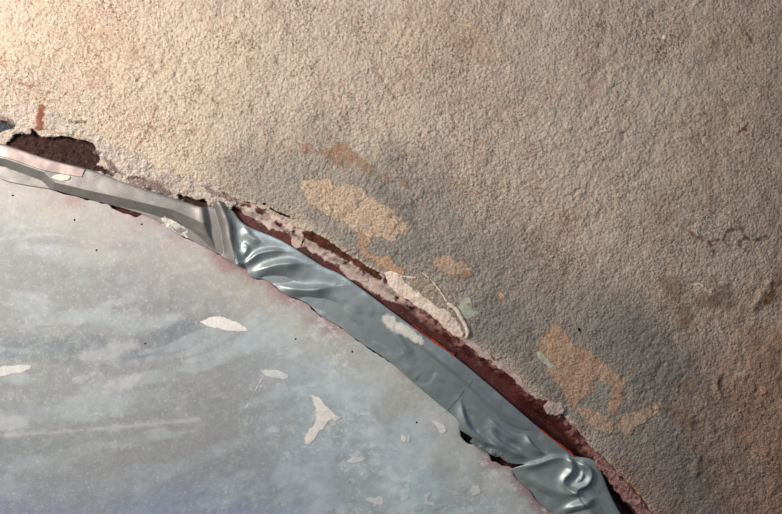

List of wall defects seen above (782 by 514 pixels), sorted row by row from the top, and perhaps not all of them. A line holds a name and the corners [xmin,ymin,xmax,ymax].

corrosion [299,143,372,169]
spalling [0,104,539,399]
corrosion [302,231,382,279]
peeling [538,325,659,438]